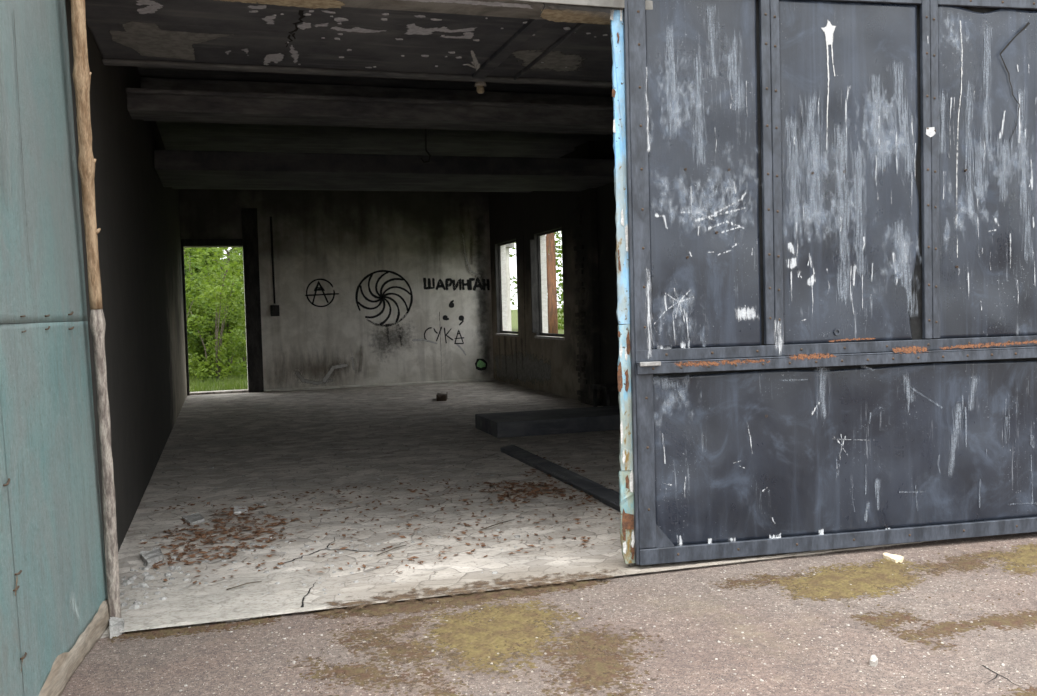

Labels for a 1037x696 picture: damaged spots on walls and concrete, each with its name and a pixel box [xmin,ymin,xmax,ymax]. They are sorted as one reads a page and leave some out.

peeling [109,0,234,60]
crack [285,10,305,47]
spalling [214,0,389,58]
spalling [395,0,622,41]
peeling [264,42,301,65]
corrosion [617,331,630,392]
corrosion [675,359,770,368]
corrosion [790,338,875,361]
corrosion [892,346,928,354]
corrosion [940,340,1037,350]
peeling [620,422,633,492]
corrosion [622,508,635,560]